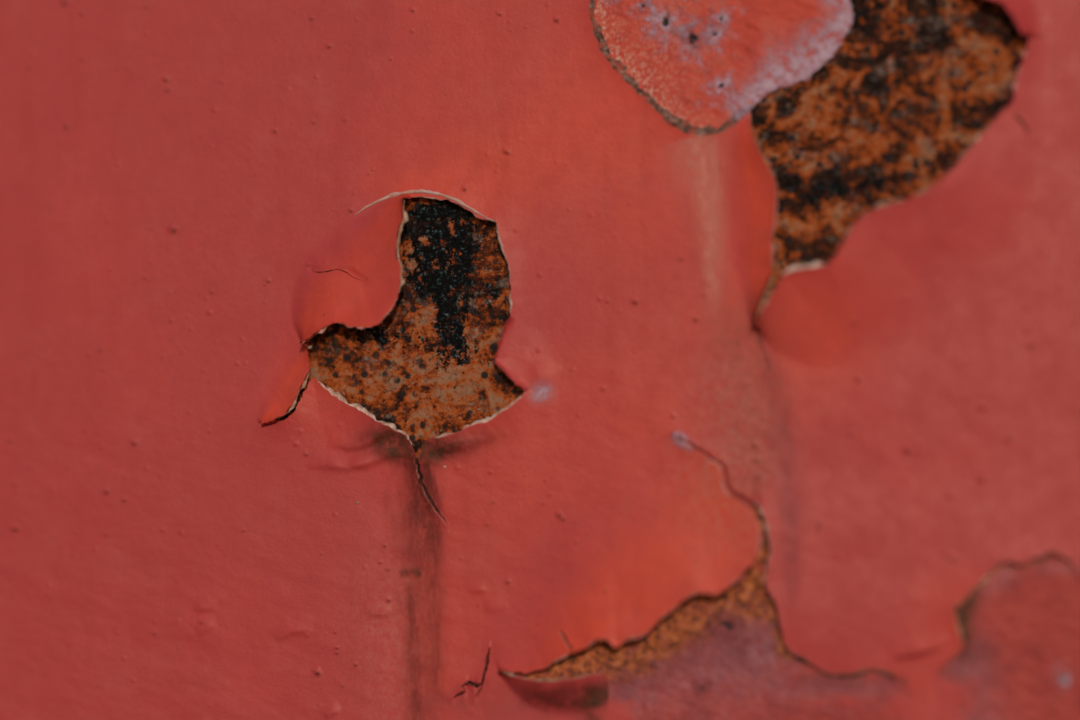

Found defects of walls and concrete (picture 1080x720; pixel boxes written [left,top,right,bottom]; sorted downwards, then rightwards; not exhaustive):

peeling [581,0,1049,333]
peeling [257,179,561,475]
crack [414,458,446,524]
crack [454,647,490,698]
peeling [477,426,1080,720]